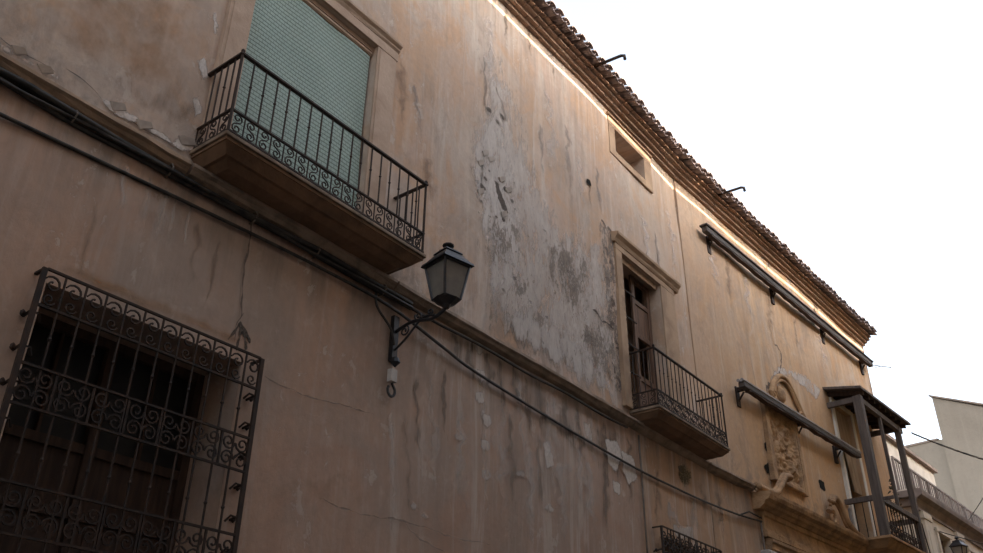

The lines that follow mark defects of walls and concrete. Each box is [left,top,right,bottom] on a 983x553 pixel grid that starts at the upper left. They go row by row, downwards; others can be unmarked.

peeling [0,37,196,151]
crack [228,221,252,351]
peeling [474,55,622,404]
peeling [605,439,637,495]